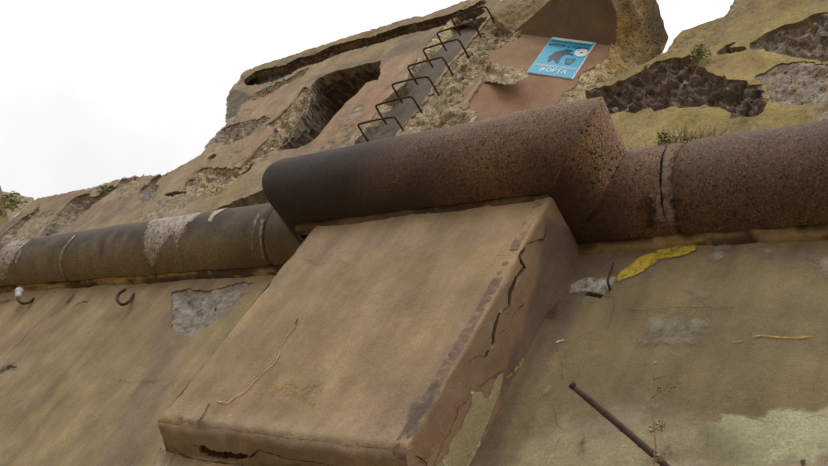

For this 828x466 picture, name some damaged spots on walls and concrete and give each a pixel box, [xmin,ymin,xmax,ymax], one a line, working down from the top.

spalling [586,14,828,118]
spalling [171,282,253,337]
crack [469,276,526,362]
crack [198,317,301,421]
crack [160,445,329,466]
crack [416,371,504,466]
peeling [436,373,504,466]
peeling [518,406,828,466]